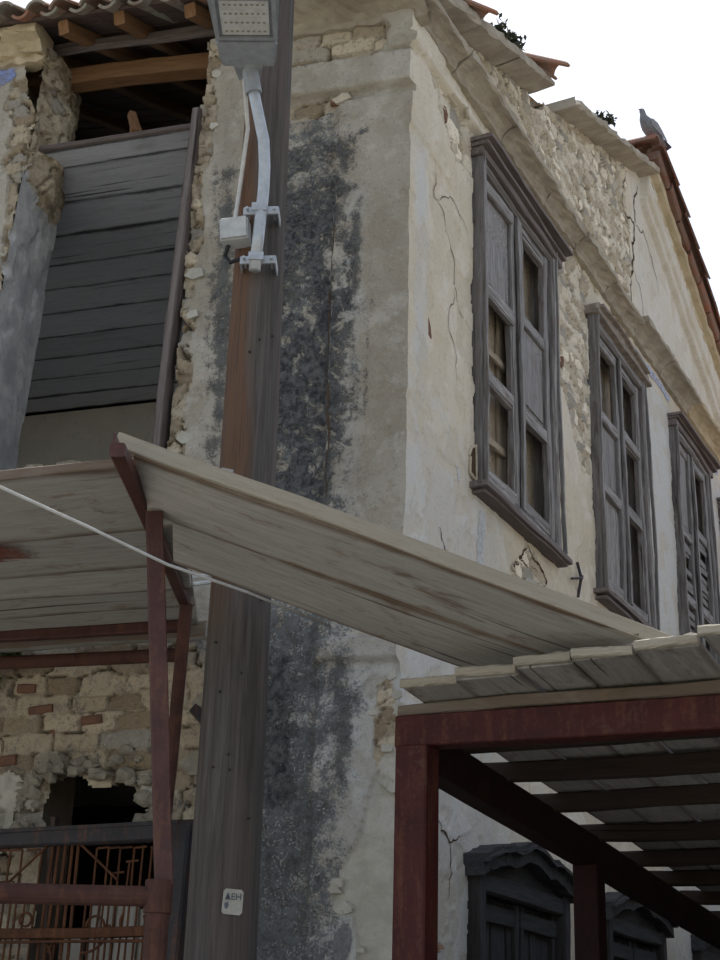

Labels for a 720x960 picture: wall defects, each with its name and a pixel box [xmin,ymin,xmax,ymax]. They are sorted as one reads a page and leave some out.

water stain [276,127,368,512]
crack [434,154,469,380]
crack [623,171,659,302]
spalling [510,546,547,588]
flaking render [0,904,37,960]
flaking render [0,847,43,883]
flaking render [0,663,153,829]
flaking render [172,643,203,820]
water stain [263,646,305,816]
water stain [318,671,363,781]
peeling [327,670,405,960]
crack [439,821,461,898]